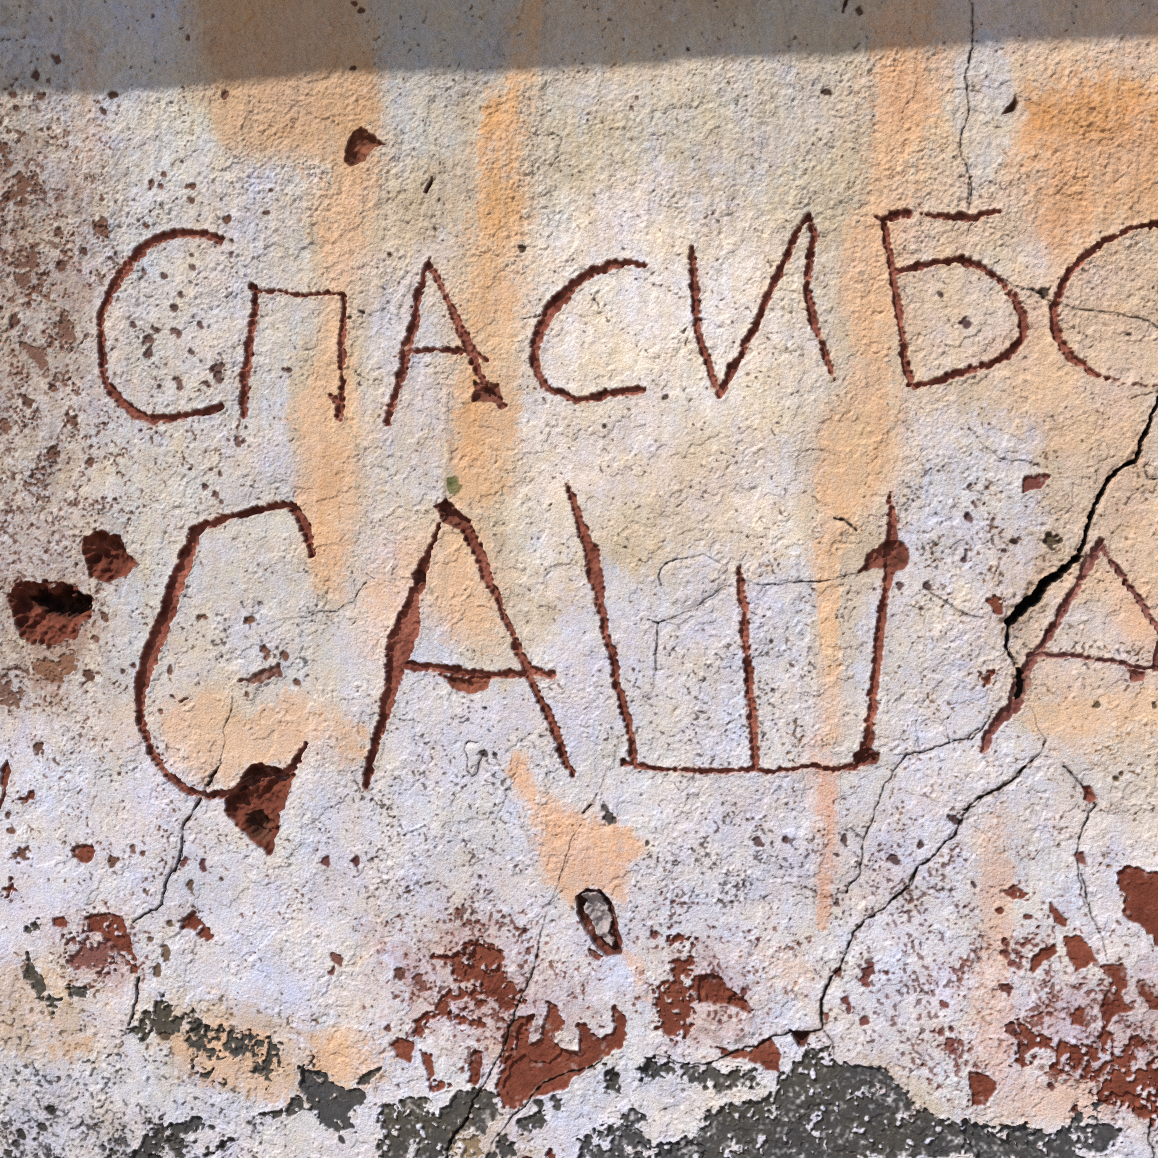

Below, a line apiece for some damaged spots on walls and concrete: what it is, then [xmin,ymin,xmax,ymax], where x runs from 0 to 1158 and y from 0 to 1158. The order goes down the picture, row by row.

crack [958,0,975,239]
crack [986,273,1158,330]
spalling [0,529,139,714]
crack [640,391,1158,1067]
peeling [22,912,138,1017]
peeling [71,844,146,869]
peeling [102,1116,237,1158]
peeling [166,910,214,943]
peeling [125,993,382,1145]
peeling [375,935,627,1158]
peeling [576,902,1158,1158]
peeling [1116,865,1158,948]